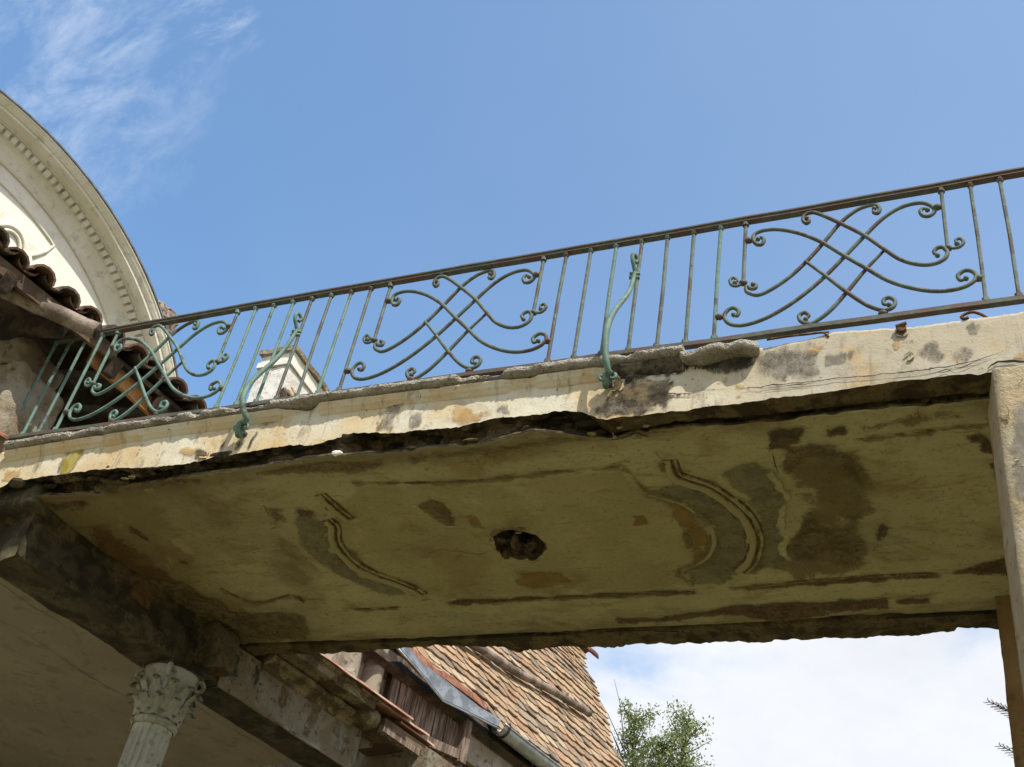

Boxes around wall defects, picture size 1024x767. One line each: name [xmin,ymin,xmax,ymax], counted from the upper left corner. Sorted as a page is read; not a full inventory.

water stain [804,346,853,365]
water stain [722,444,874,580]
spalling [495,530,547,559]
peeling [222,610,306,636]
peeling [449,596,540,606]
peeling [616,596,930,625]